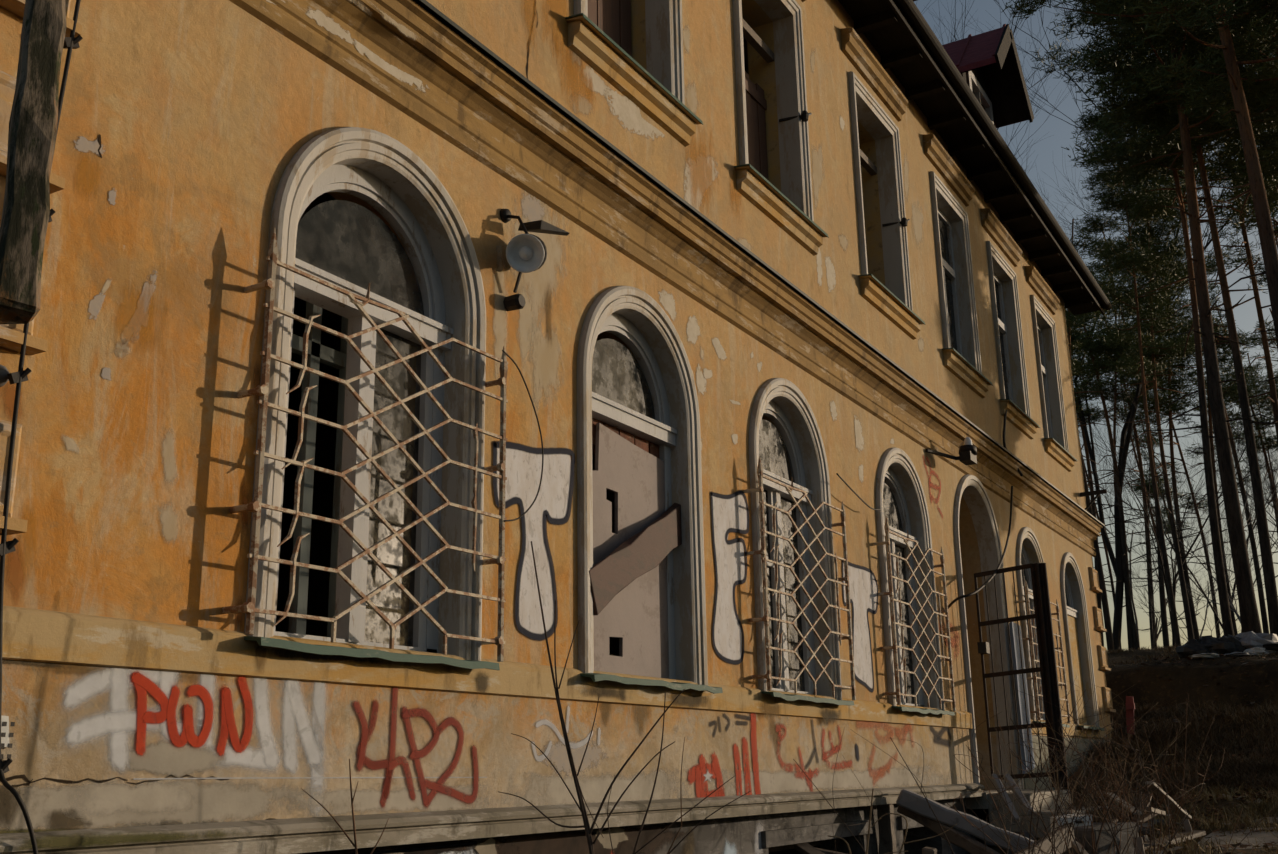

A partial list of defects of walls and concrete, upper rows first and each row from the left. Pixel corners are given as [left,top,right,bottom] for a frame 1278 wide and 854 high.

flaking render [306,7,428,92]
crack [526,0,538,78]
peeling [571,50,665,140]
peeling [74,134,105,158]
peeling [88,280,111,320]
peeling [115,270,157,357]
peeling [658,290,727,395]
peeling [162,432,178,483]
damp [0,786,226,850]
crack [5,774,229,787]